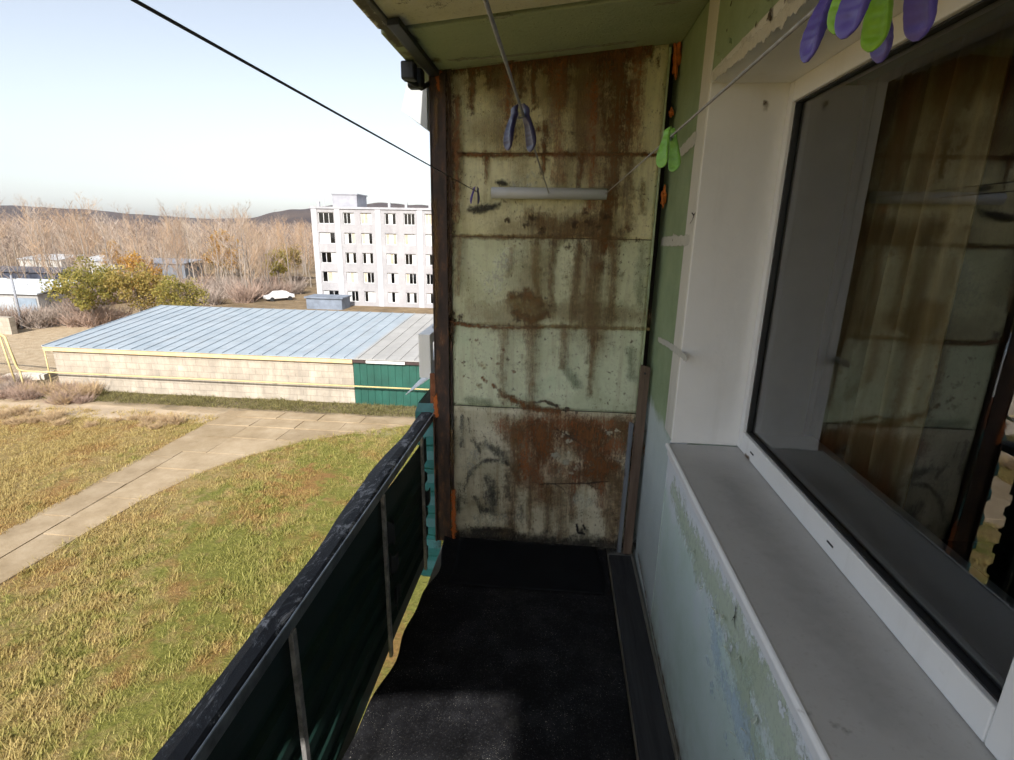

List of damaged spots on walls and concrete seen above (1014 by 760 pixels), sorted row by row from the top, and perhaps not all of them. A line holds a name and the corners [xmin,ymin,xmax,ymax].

corrosion [432,45,661,538]
peeling [671,483,806,760]